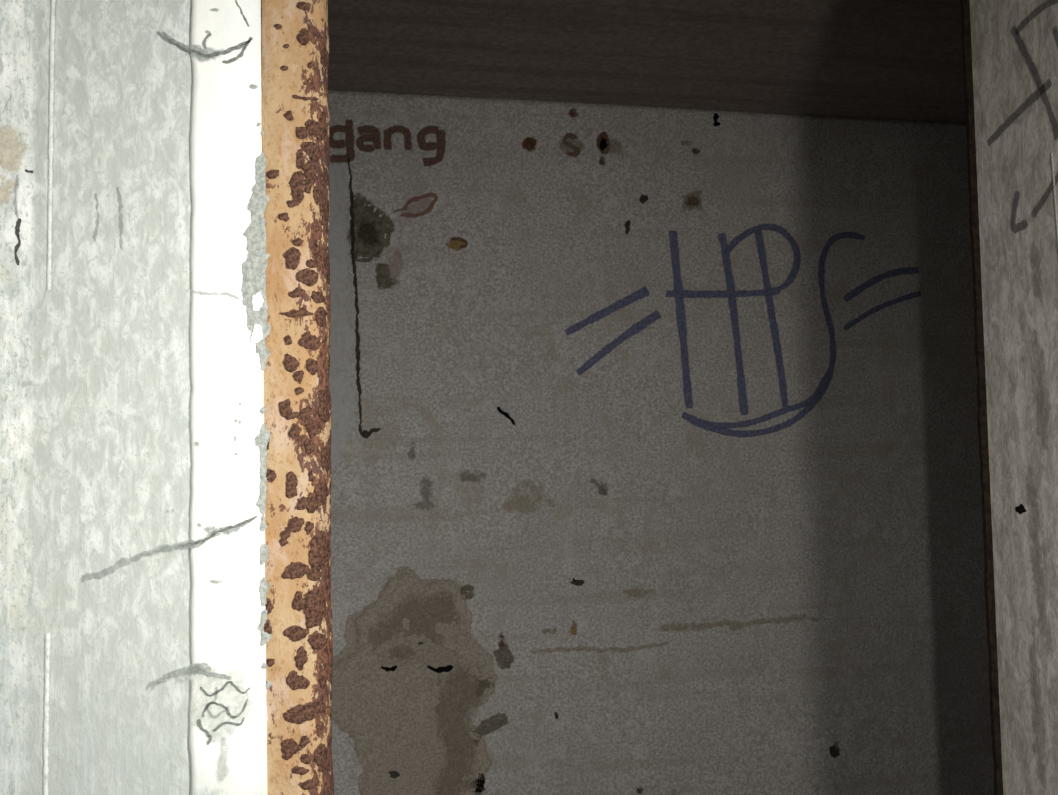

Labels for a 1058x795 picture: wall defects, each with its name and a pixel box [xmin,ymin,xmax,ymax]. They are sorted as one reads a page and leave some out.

crack [161,0,253,64]
rust [283,28,309,49]
rust [267,95,329,222]
rust [264,238,331,690]
crack [147,516,258,555]
rust [281,701,328,795]